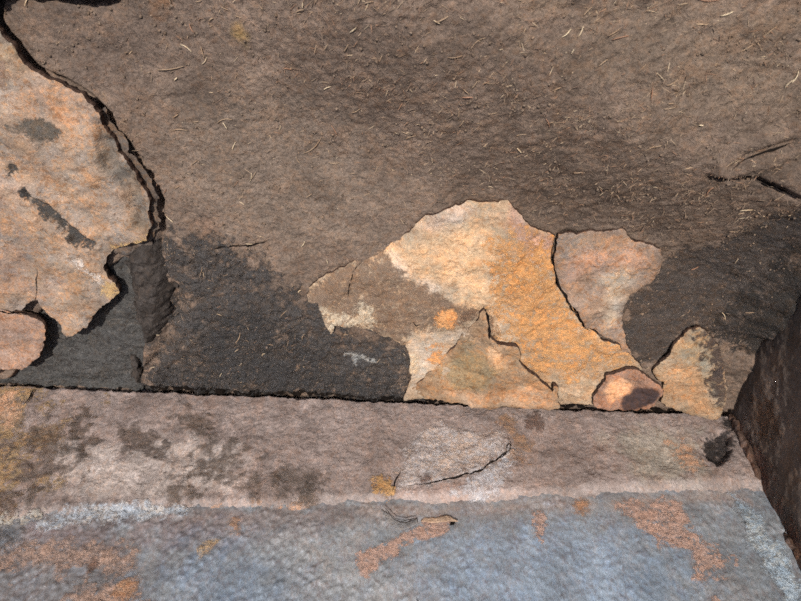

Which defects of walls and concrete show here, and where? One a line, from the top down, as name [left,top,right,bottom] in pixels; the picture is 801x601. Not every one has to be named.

spalling [0,24,162,243]
peeling [0,249,145,392]
leakage [140,225,411,403]
crack [484,312,492,340]
spalling [402,199,663,368]
crack [550,238,590,331]
spalling [652,325,719,406]
leakage [272,463,329,508]
crack [384,437,511,521]